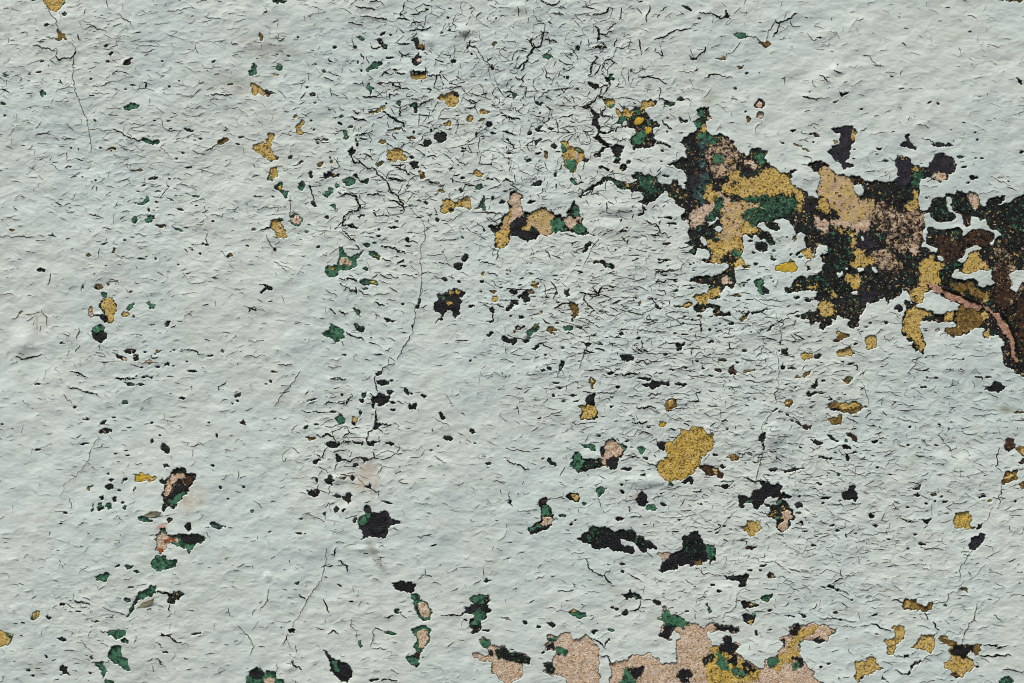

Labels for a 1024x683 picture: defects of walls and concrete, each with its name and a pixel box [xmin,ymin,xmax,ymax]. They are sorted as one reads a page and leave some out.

crack [716,90,778,147]
crack [861,102,929,135]
crack [917,0,1024,155]
peeling [435,97,1024,389]
crack [273,350,300,407]
peeling [434,254,598,420]
crack [0,407,190,683]
peeling [87,435,226,572]
crack [191,547,253,617]
peeling [462,570,842,683]
peeling [577,517,775,592]
peeling [570,426,807,550]